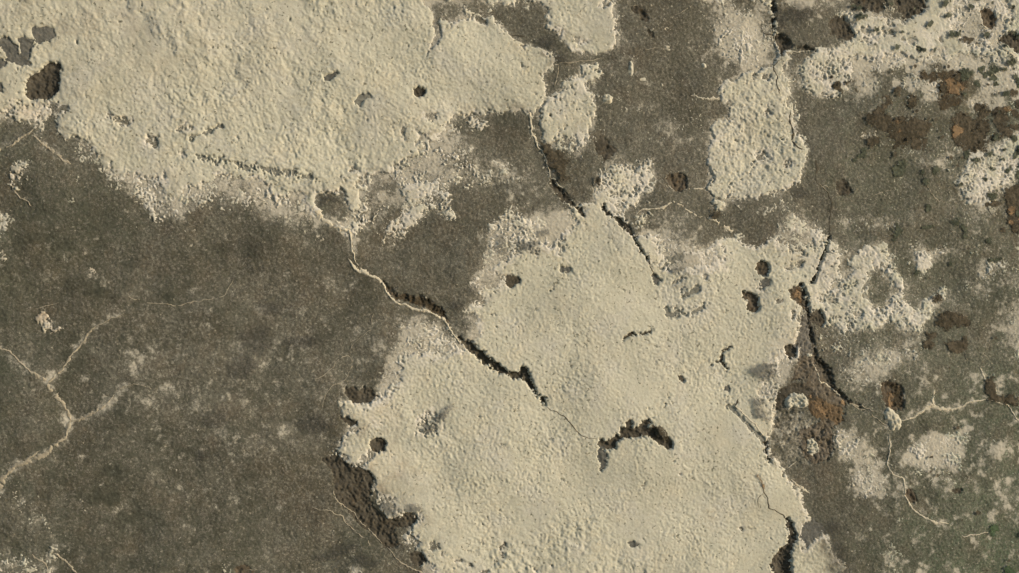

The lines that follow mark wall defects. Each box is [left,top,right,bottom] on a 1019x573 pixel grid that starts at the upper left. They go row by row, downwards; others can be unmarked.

peeling [0,26,56,70]
spalling [25,63,61,100]
water stain [830,75,860,100]
water stain [851,4,1019,244]
rust [920,69,969,111]
crack [528,110,733,276]
crack [315,210,596,439]
crack [763,0,1019,537]
water stain [923,293,971,354]
spalling [322,437,420,549]
spalling [589,419,673,471]
crack [725,399,809,573]